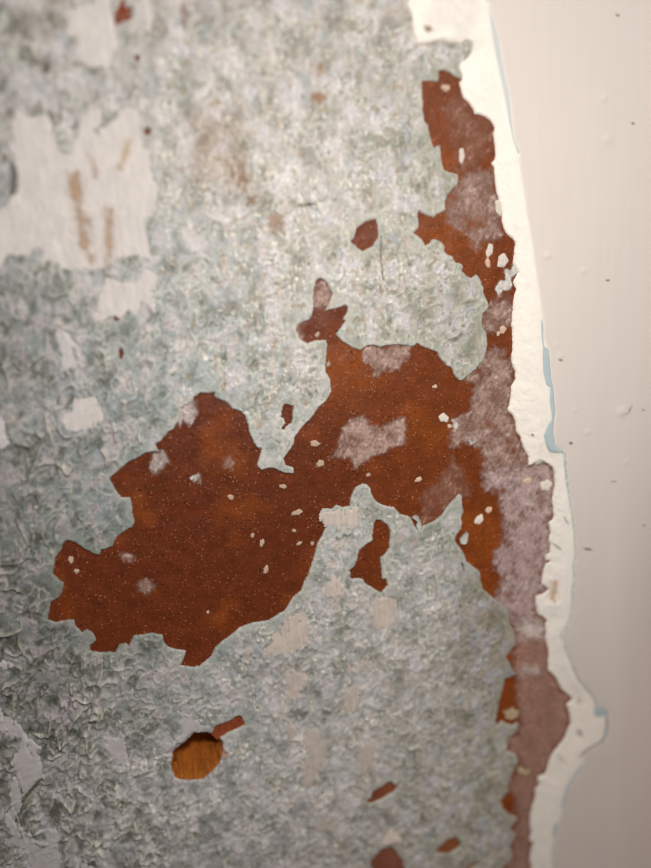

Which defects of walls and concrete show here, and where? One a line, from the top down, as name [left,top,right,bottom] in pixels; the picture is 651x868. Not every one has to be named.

peeling [114,0,133,25]
corrosion [69,172,92,262]
peeling [48,70,555,667]
flaking render [408,0,608,868]
spalling [211,715,245,739]
peeling [367,782,400,803]
peeling [370,847,404,868]